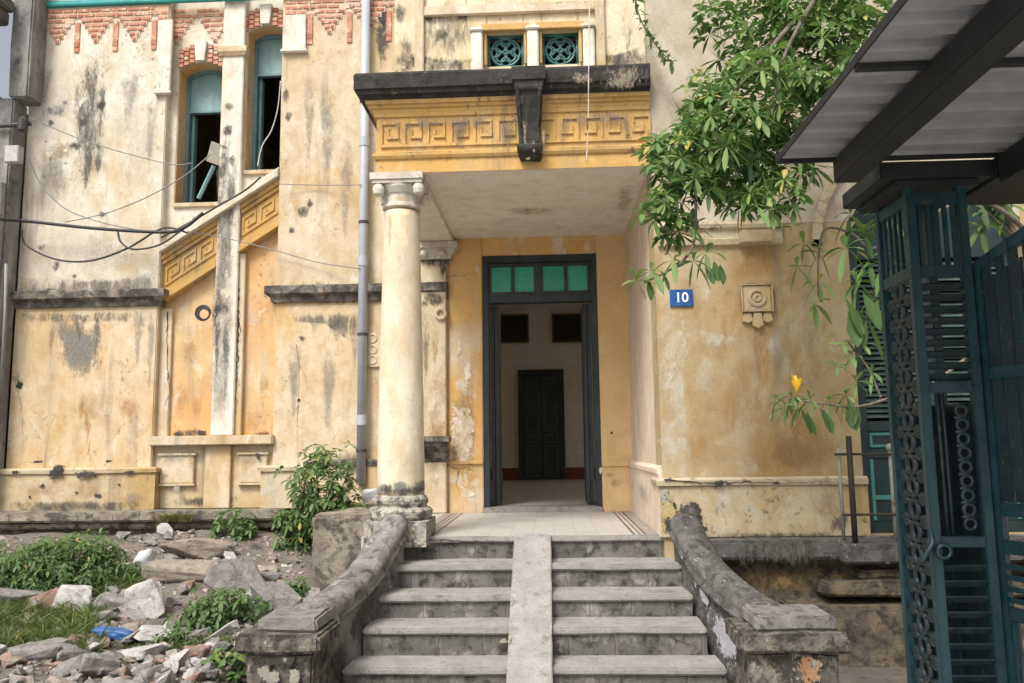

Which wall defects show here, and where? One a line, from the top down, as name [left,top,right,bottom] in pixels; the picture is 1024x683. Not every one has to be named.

damp [46,67,105,180]
crack [163,312,171,413]
damp [212,293,229,363]
damp [300,301,355,336]
peeling [456,336,471,387]
peeling [450,400,477,474]
flaking render [660,477,676,535]
peeling [694,580,736,669]
flaking render [797,654,823,683]